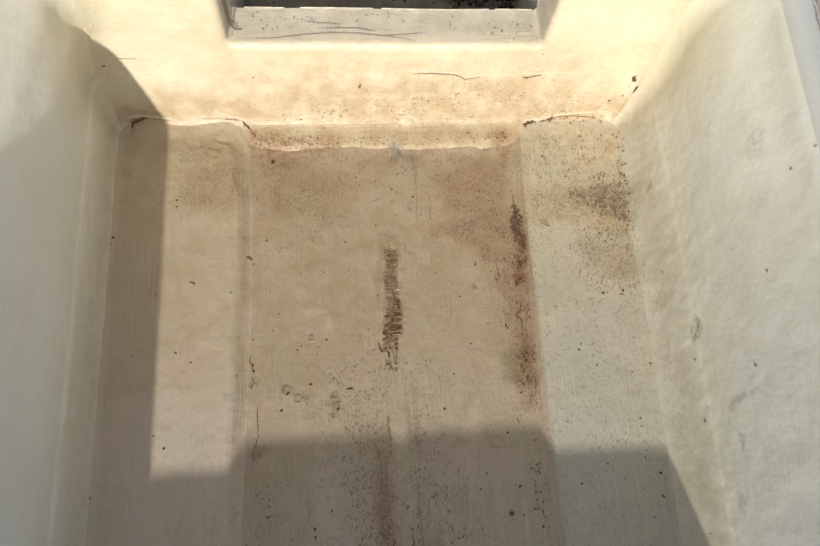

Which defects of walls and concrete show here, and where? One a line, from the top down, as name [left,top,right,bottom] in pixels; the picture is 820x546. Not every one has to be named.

crack [380,70,625,86]
damp [532,124,645,276]